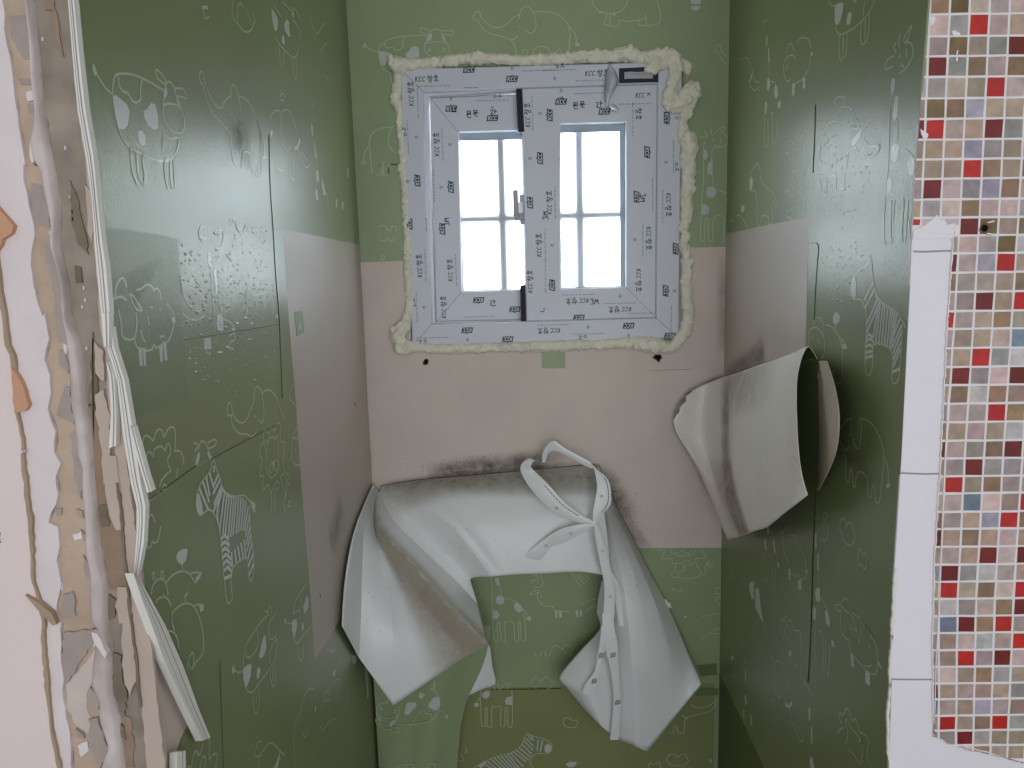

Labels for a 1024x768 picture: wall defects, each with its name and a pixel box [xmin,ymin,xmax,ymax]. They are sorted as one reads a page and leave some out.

flaking render [0,0,210,768]
leakage [380,458,526,489]
leakage [534,457,597,486]